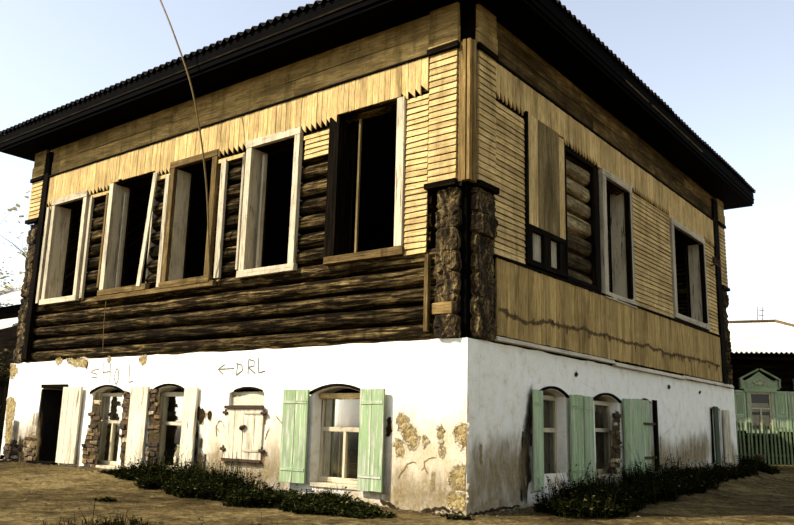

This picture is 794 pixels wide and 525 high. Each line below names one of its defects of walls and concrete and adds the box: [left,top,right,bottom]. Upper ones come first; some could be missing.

flaking render [55,356,89,369]
flaking render [3,395,38,462]
flaking render [81,393,102,468]
flaking render [118,390,131,467]
flaking render [144,388,162,468]
flaking render [386,412,470,459]
water stain [386,391,532,512]
flaking render [607,410,623,473]
flaking render [446,465,469,513]